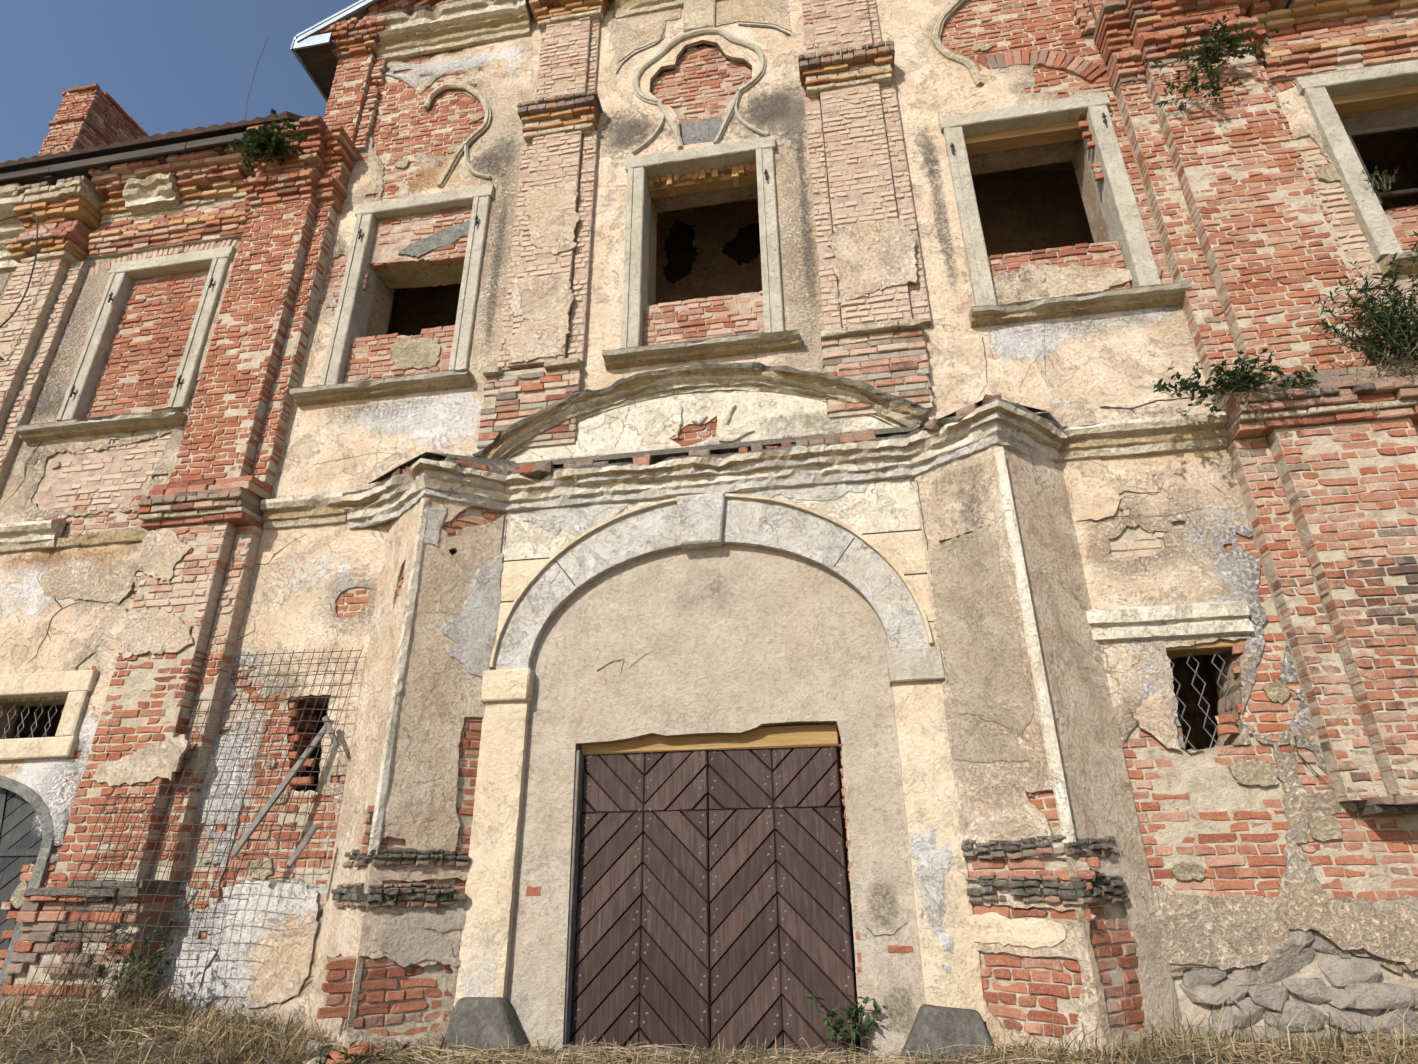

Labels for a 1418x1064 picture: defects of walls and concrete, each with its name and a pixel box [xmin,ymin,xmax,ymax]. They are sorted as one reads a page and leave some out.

crack [0,441,42,509]
flaking render [671,417,717,447]
crack [30,528,86,661]
peeling [0,734,191,973]
flaking render [170,665,346,930]
flaking render [360,805,406,861]
flaking render [454,717,483,861]
peeling [928,524,1034,763]
flaking render [1027,788,1072,835]
flaking render [1123,534,1418,902]
flaking render [317,878,466,1036]
flaking render [908,829,1145,1043]